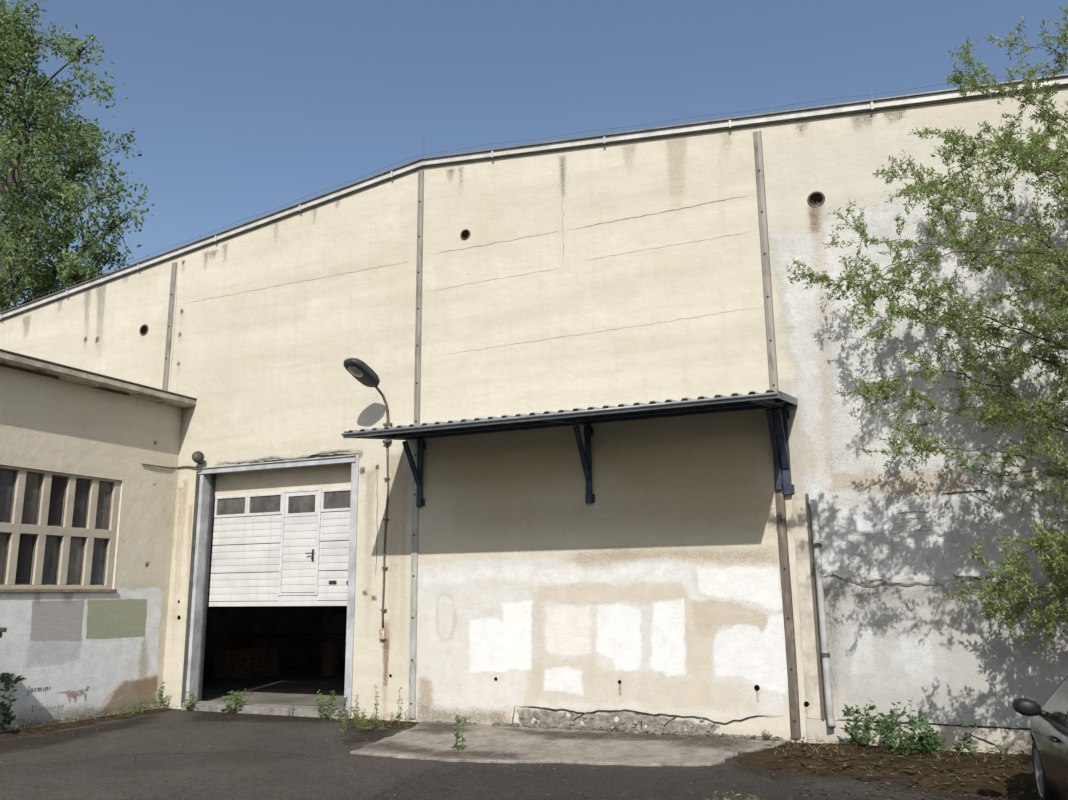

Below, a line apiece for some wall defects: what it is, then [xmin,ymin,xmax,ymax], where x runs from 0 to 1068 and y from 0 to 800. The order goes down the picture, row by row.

crack [170,155,741,381]
corrosion [807,201,838,478]
corrosion [360,452,409,718]
crack [823,574,994,587]
crack [512,706,781,730]